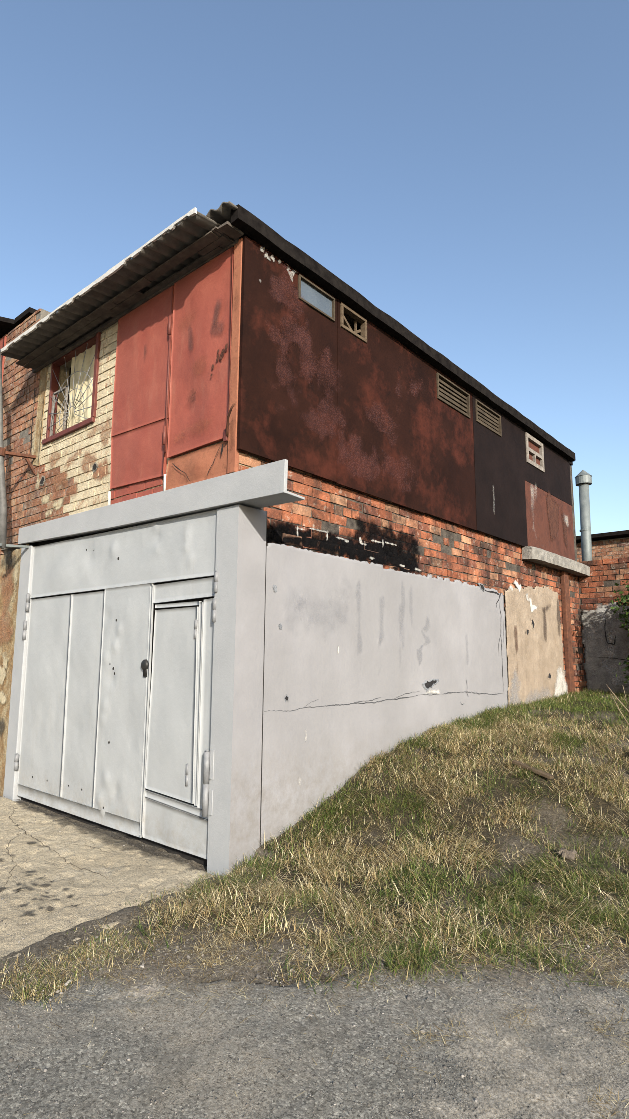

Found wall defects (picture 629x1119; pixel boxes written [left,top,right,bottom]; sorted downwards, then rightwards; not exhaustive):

peeling [36,452,108,517]
flaking render [0,549,18,704]
crack [264,590,504,712]
flaking render [510,580,537,636]